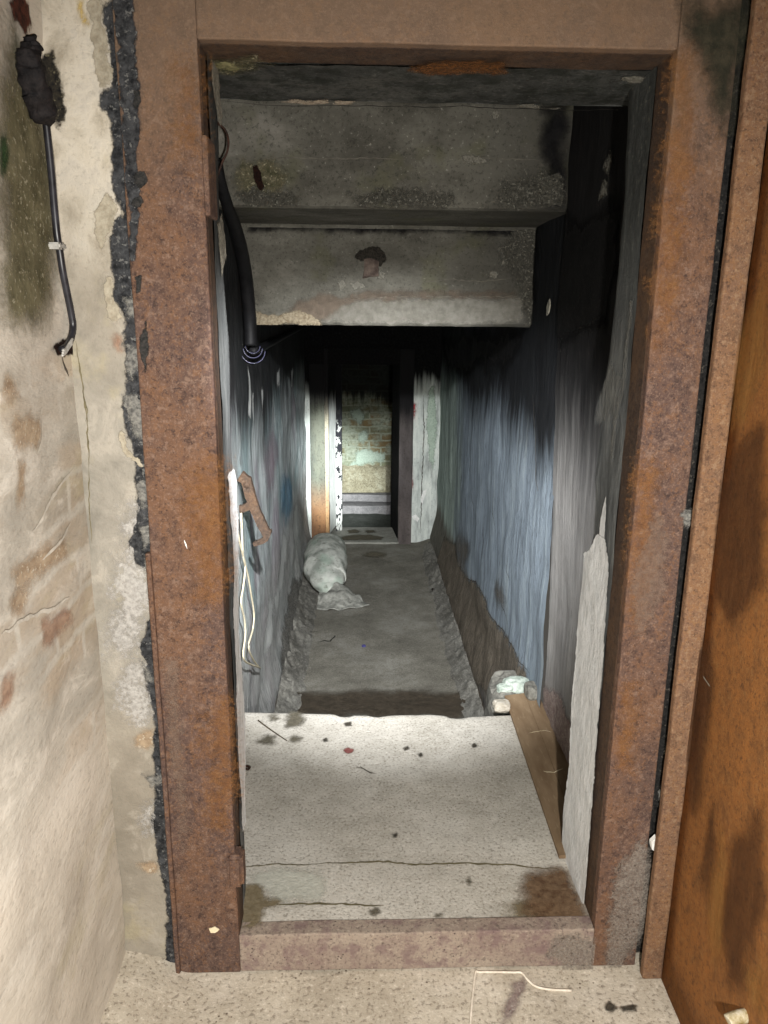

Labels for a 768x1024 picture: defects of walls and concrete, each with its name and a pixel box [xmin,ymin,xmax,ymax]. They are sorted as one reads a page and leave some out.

rust [408,60,508,76]
spalling [87,0,150,568]
spalling [136,620,175,963]
crack [249,860,557,869]
water stain [512,867,587,917]
peeling [543,497,609,904]
rust [687,650,712,808]